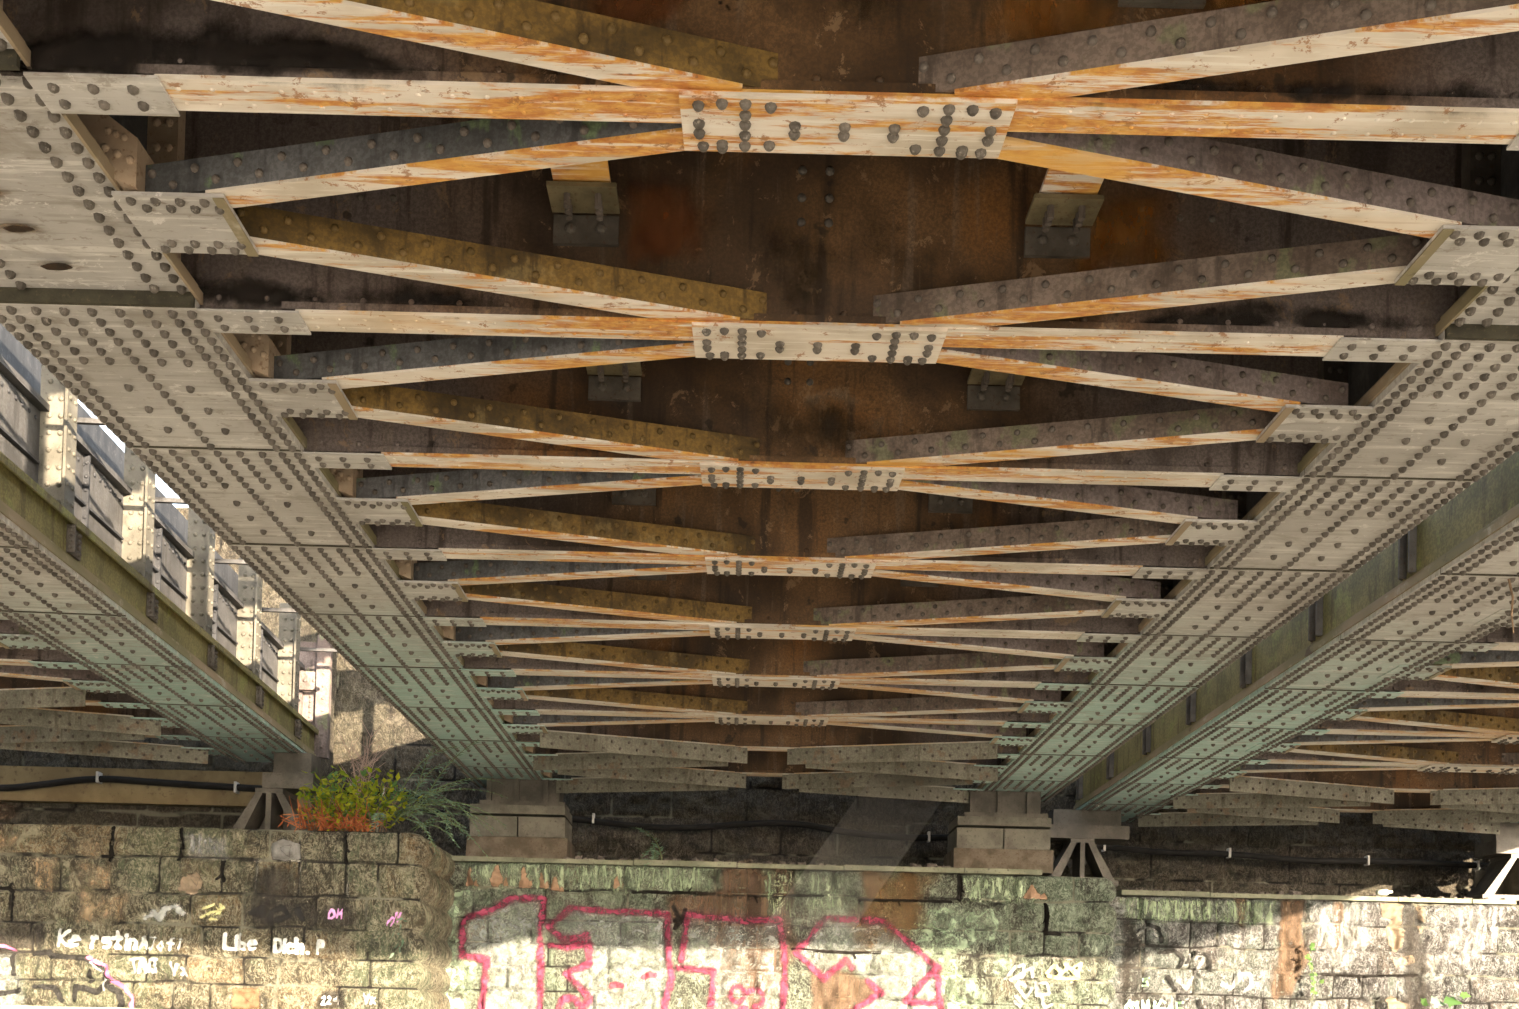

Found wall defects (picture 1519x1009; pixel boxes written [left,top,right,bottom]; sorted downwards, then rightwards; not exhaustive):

rust [596,0,680,23]